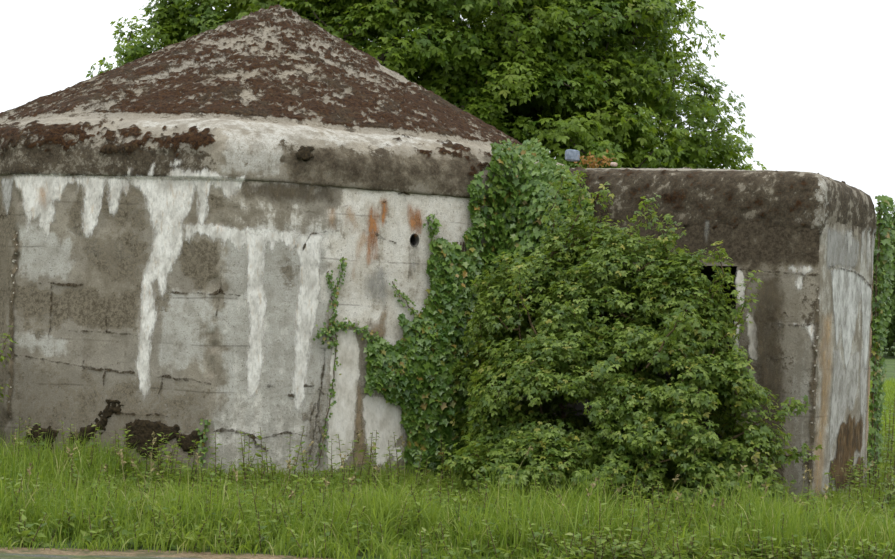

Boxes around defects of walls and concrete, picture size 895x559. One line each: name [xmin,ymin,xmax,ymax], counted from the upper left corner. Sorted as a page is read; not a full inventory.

rust [368,201,386,261]
rust [410,208,422,229]
water stain [2,161,333,410]
peeling [830,414,863,489]